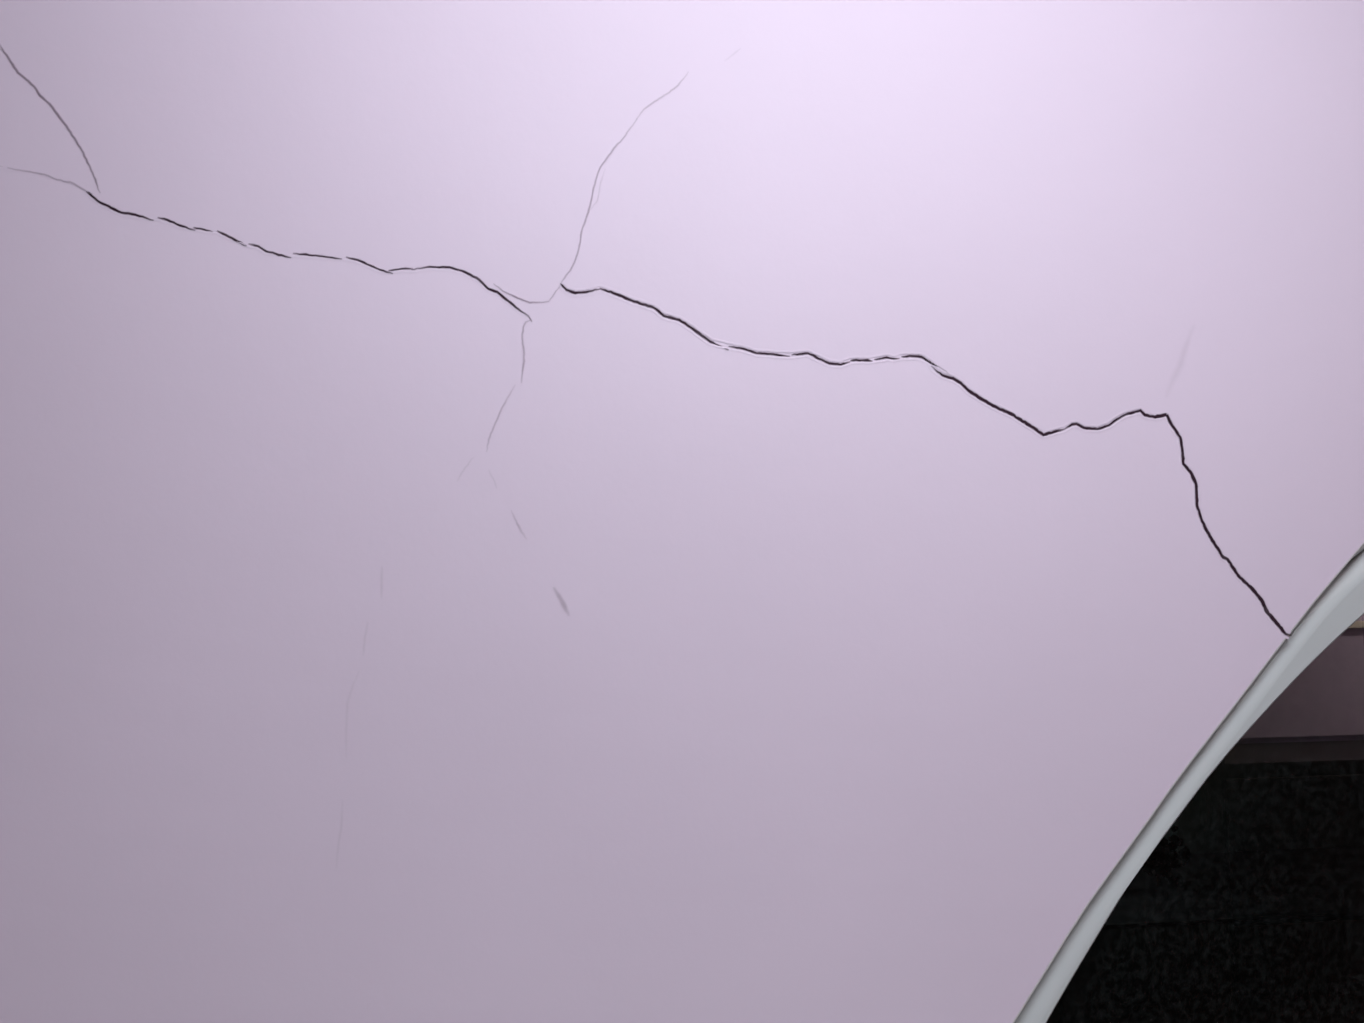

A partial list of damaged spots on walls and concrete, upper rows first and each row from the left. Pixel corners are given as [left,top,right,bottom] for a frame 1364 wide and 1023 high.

crack [84,191,530,319]
crack [558,281,1292,639]